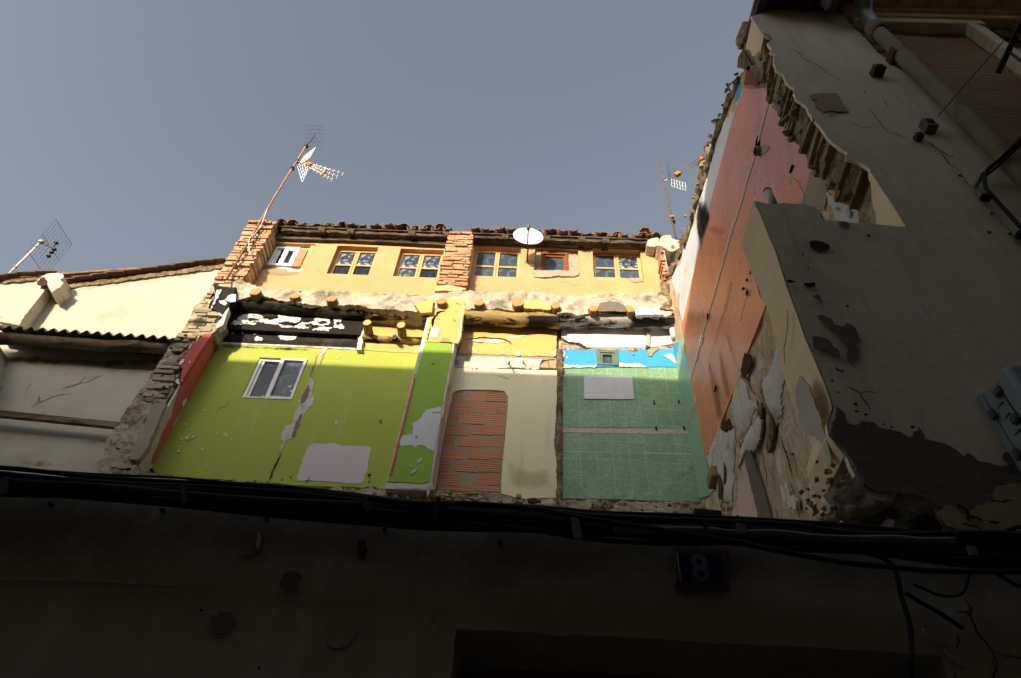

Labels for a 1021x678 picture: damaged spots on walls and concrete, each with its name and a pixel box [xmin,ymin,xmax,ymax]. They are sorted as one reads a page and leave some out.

peeling [809,93,849,115]
flaking render [826,190,861,227]
spalling [802,240,830,256]
flaking render [597,301,627,312]
peeling [786,280,861,393]
peeling [280,377,315,452]
peeling [399,407,442,475]
flaking render [706,347,1021,532]
crack [956,598,1021,678]